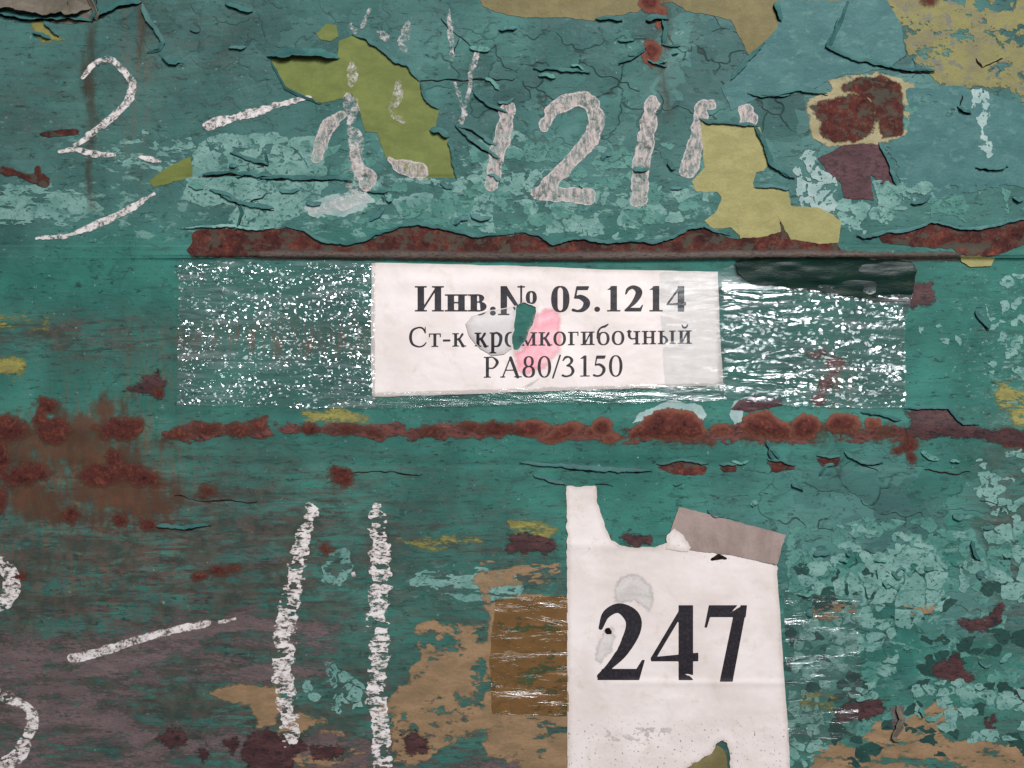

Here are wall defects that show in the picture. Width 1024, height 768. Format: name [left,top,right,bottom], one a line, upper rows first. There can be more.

peeling [106,24,969,244]
peeling [480,0,641,21]
rust [638,0,667,68]
peeling [659,0,778,54]
rust [810,75,904,143]
peeling [887,0,1024,158]
rust [185,221,842,259]
rust [879,218,1024,257]
rust [0,394,218,531]
rust [161,349,1024,467]
peeling [0,548,568,768]
peeling [783,449,1024,768]